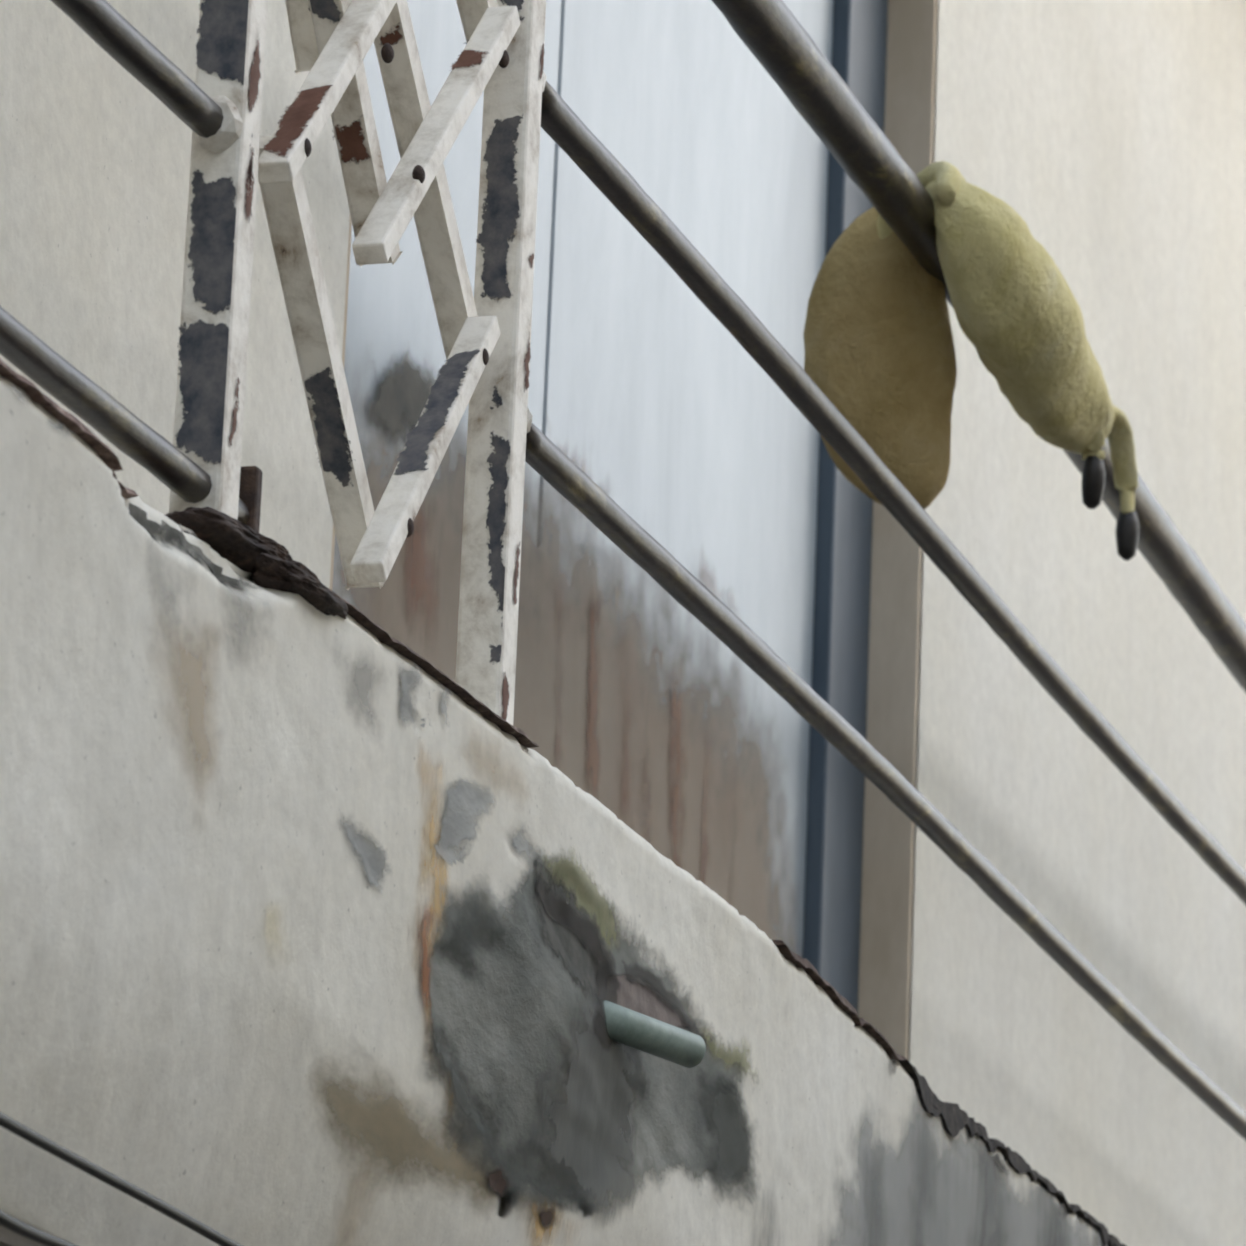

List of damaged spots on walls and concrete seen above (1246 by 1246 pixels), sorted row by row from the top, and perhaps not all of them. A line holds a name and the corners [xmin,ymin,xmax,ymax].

peeling [400,667,425,728]
peeling [343,818,387,887]
rust [421,817,447,1021]
peeling [435,780,494,864]
spalling [428,832,755,1214]
water stain [830,1113,1105,1246]